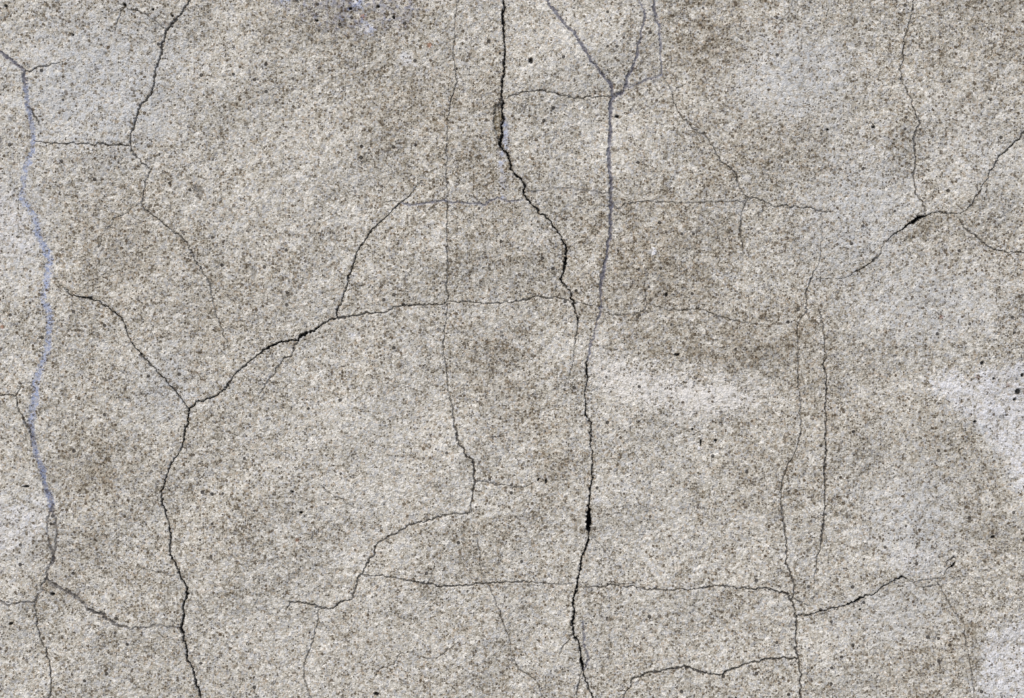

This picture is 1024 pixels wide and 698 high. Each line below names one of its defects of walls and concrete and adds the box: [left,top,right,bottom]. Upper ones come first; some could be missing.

crack [0,0,603,698]
crack [283,0,1024,698]